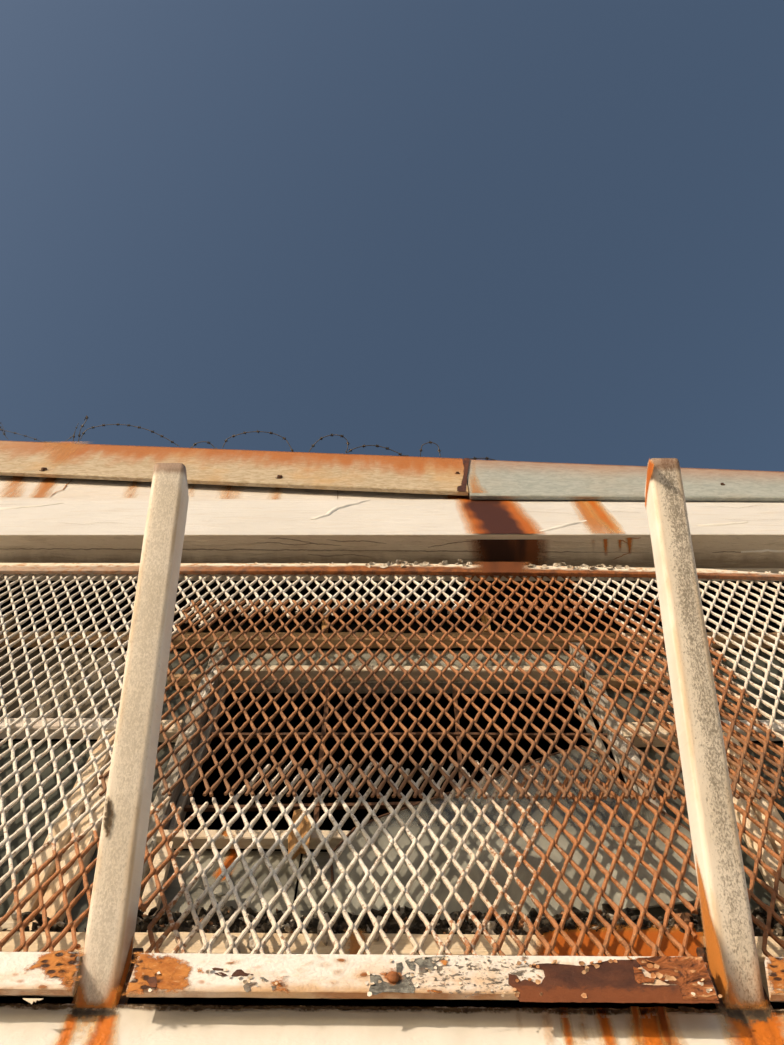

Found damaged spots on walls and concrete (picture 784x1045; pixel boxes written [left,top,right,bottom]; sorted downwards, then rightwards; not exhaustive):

corrosion [6,476,25,497]
corrosion [34,477,56,498]
corrosion [448,458,544,572]
corrosion [575,500,632,552]
corrosion [26,938,204,1045]
peeling [365,956,448,997]
corrosion [508,864,784,1045]
peeling [633,956,722,1013]